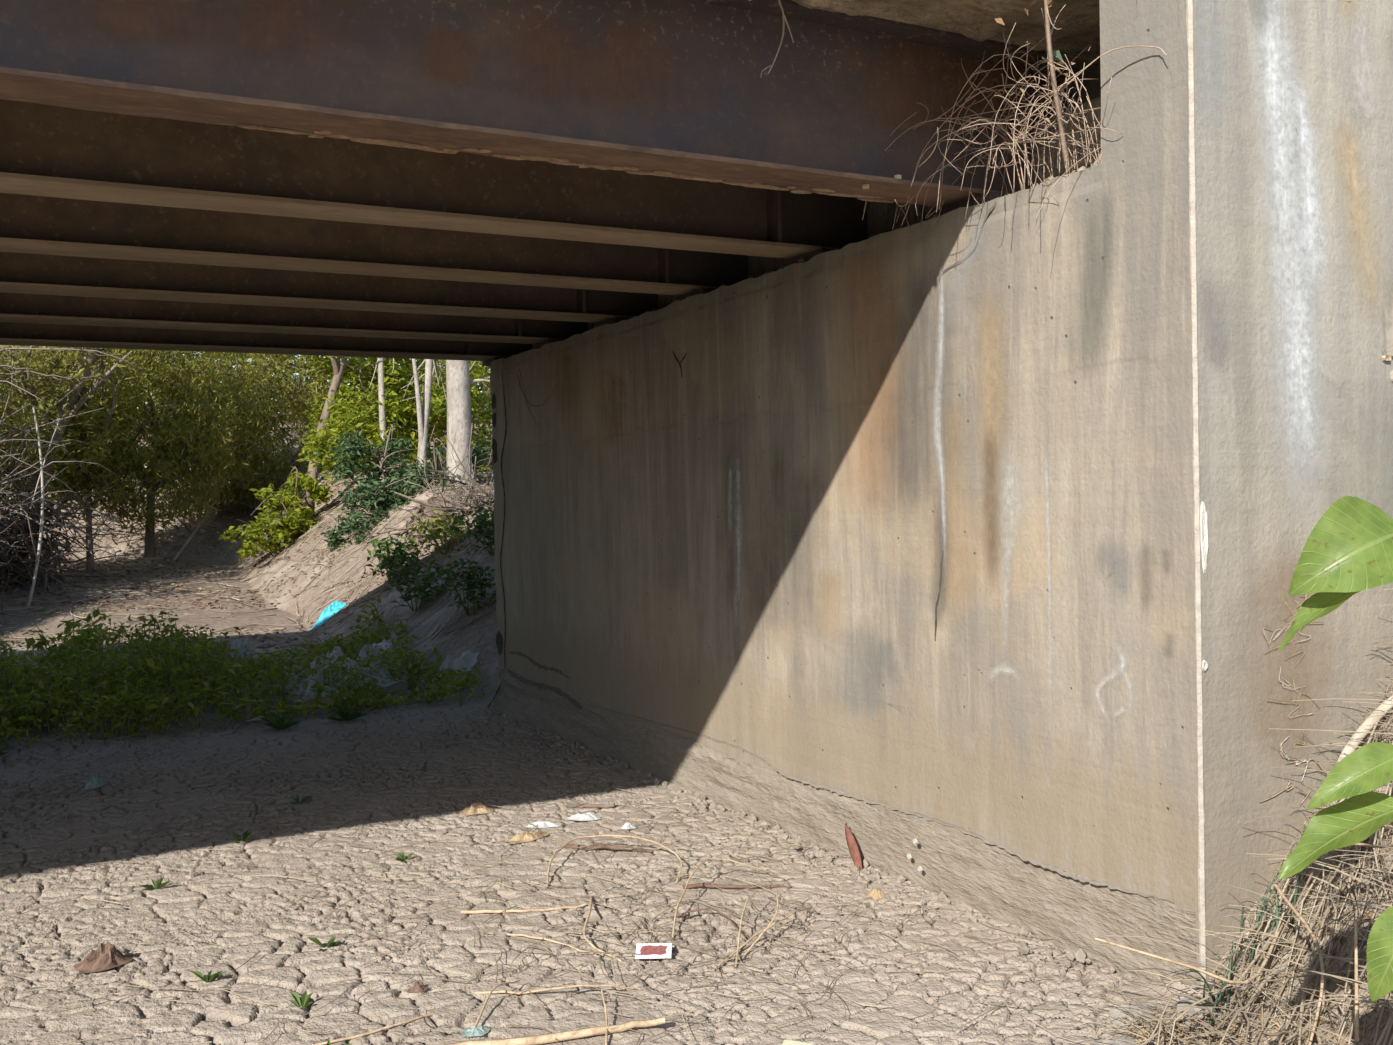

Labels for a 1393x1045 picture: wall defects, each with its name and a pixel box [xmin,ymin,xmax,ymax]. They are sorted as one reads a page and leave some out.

rust [237,124,894,203]
efflorescence [1261,4,1323,461]
water stain [898,295,945,521]
crack [486,372,583,709]
crack [935,475,944,634]
water stain [1096,650,1132,713]